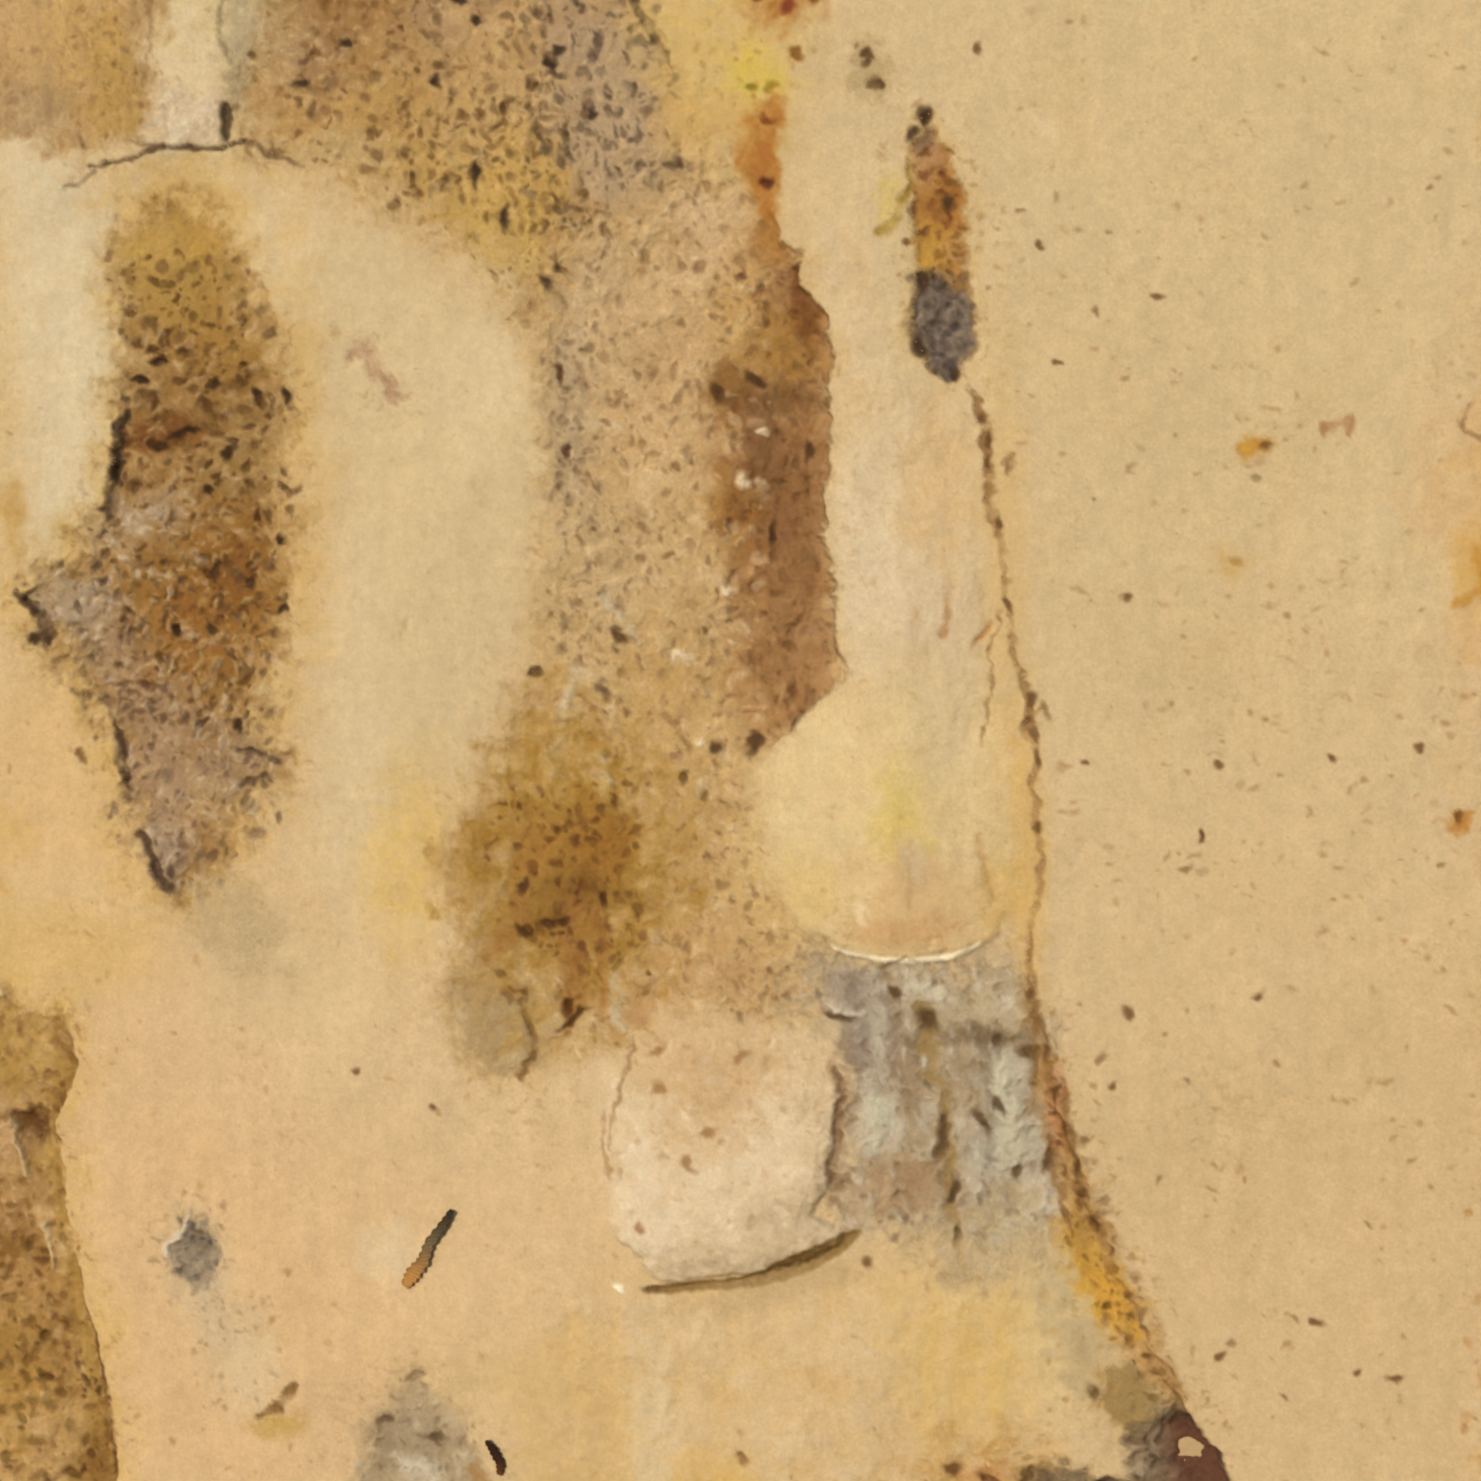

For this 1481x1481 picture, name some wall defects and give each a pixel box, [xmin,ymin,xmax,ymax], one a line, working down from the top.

crack [64,138,307,191]
flaking render [0,0,706,325]
rust [620,0,835,221]
flaking render [845,31,896,107]
flaking render [12,171,315,981]
flaking render [425,112,1230,1481]
crack [971,389,1230,1478]
flaking render [0,982,119,1481]
peeling [163,1210,223,1296]
flaking render [402,1209,453,1289]
peeling [241,1383,310,1442]
peeling [351,1363,505,1481]